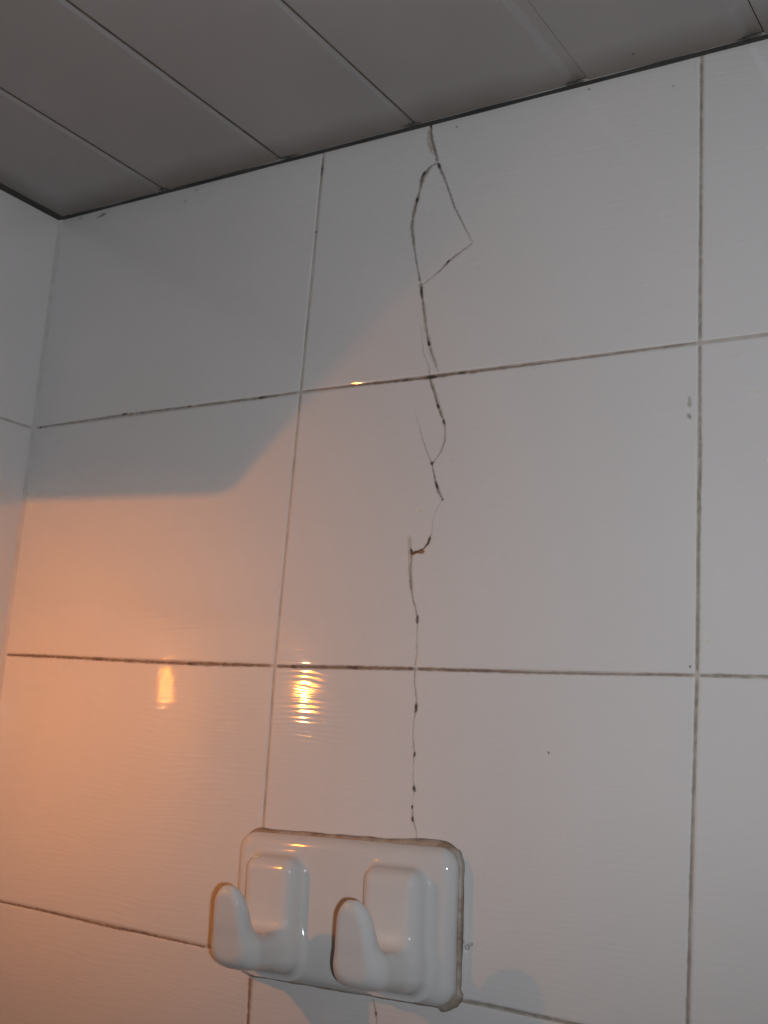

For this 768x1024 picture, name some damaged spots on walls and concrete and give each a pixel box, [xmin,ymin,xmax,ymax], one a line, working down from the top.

crack [416,125,451,204]